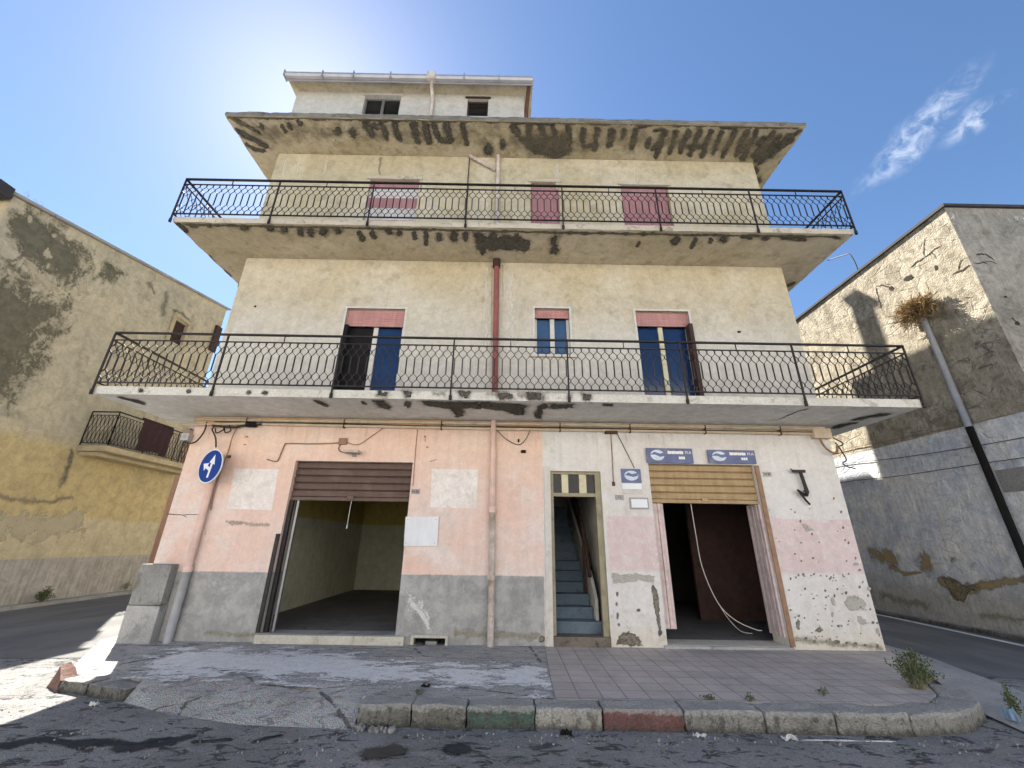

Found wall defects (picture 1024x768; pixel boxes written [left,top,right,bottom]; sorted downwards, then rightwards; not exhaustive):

spalling [227,116,803,183]
peeling [176,223,841,255]
water stain [0,204,124,408]
spalling [361,390,591,419]
water stain [406,592,439,632]
peeling [612,573,662,647]
spalling [788,509,882,649]
spalling [942,575,980,602]